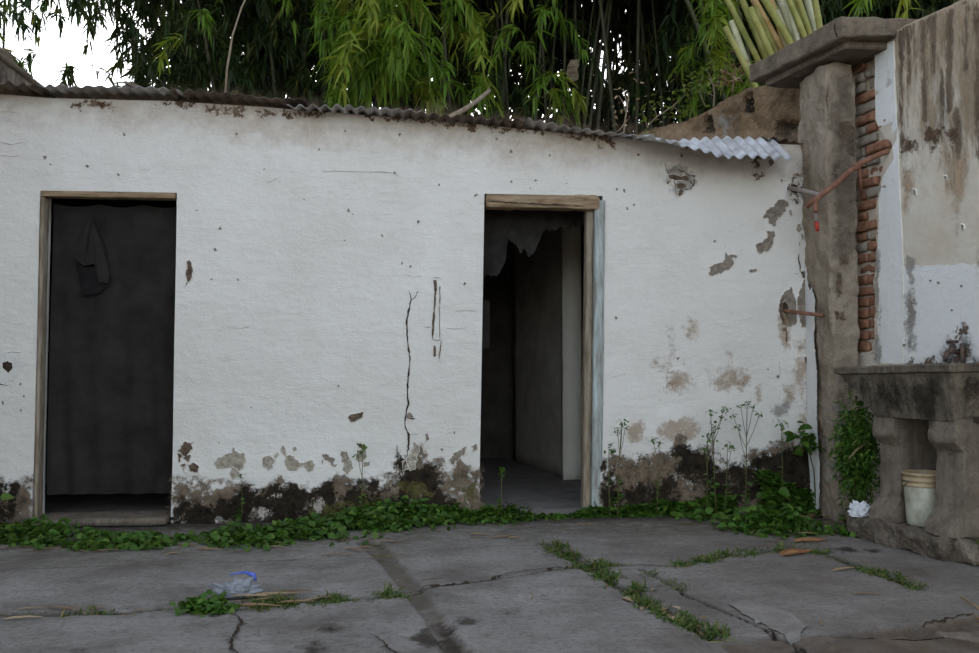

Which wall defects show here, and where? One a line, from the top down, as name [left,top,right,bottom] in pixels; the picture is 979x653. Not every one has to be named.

leakage [897,2,979,197]
spalling [665,164,696,197]
peeling [755,179,804,255]
peeling [707,252,738,277]
leakage [904,256,976,364]
crack [397,291,419,475]
leakage [0,476,35,527]
peeling [177,440,200,473]
peeling [214,446,247,480]
peeling [262,443,370,475]
leakage [170,446,484,524]
leakage [599,434,810,514]